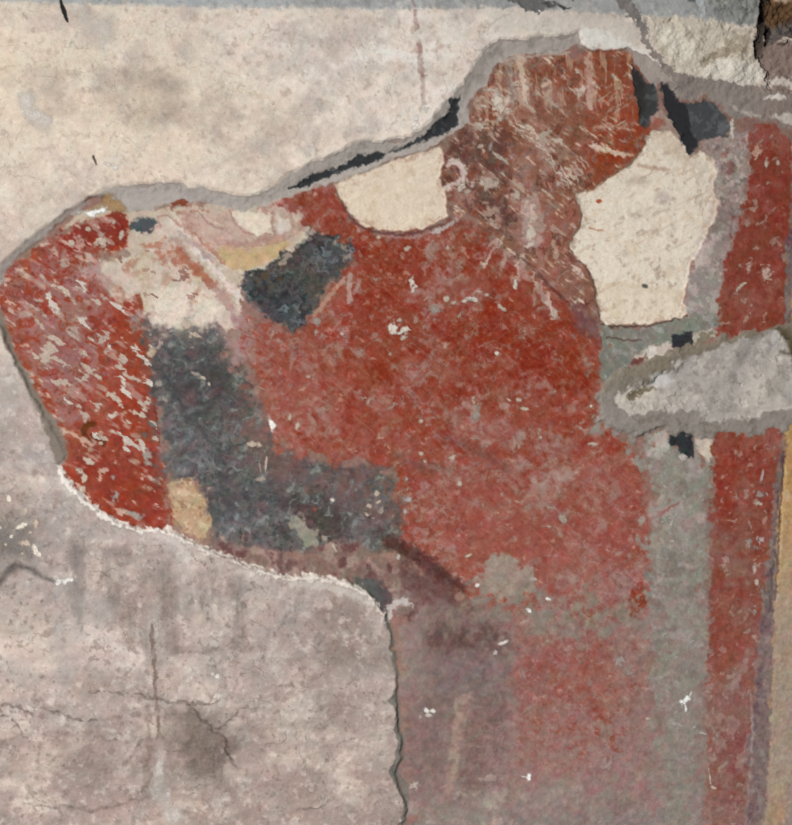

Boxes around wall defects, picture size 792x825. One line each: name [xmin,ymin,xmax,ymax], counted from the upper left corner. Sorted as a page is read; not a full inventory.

peeling [480,81,559,121]
peeling [51,350,102,386]
peeling [27,270,129,367]
peeling [64,344,162,465]
flaking render [334,147,470,239]
peeling [388,316,418,340]
peeling [444,290,488,304]
peeling [475,118,524,202]
flaking render [529,129,719,326]
peeling [739,262,774,280]
spalling [56,457,388,621]
crack [385,614,408,825]